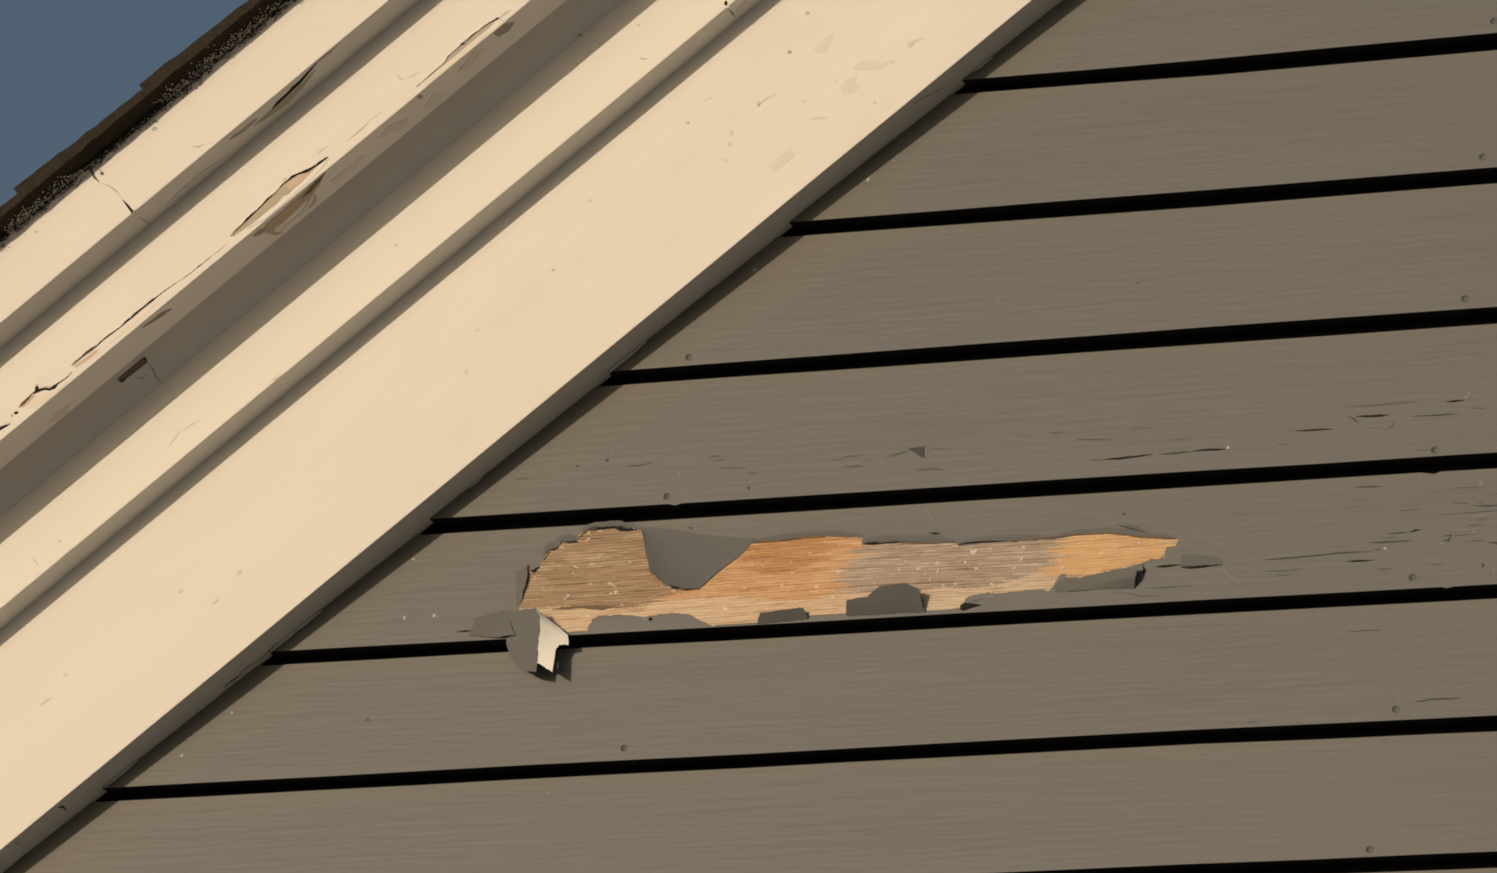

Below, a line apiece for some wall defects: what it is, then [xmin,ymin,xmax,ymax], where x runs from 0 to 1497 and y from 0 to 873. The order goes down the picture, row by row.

crack [192,41,341,148]
crack [398,10,510,87]
peeling [228,153,329,236]
crack [19,112,382,407]
peeling [0,301,159,431]
peeling [469,520,1178,637]